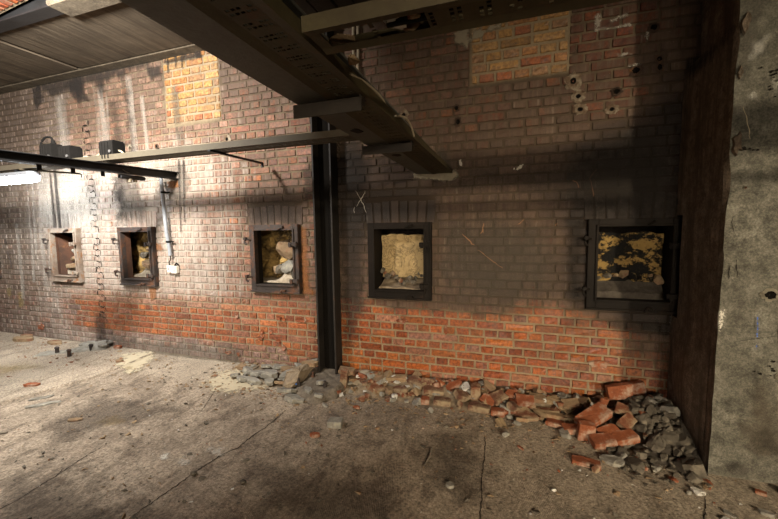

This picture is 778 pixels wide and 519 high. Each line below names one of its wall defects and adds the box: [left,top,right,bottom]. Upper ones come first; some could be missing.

crack [130,412,283,518]
crack [478,436,486,519]